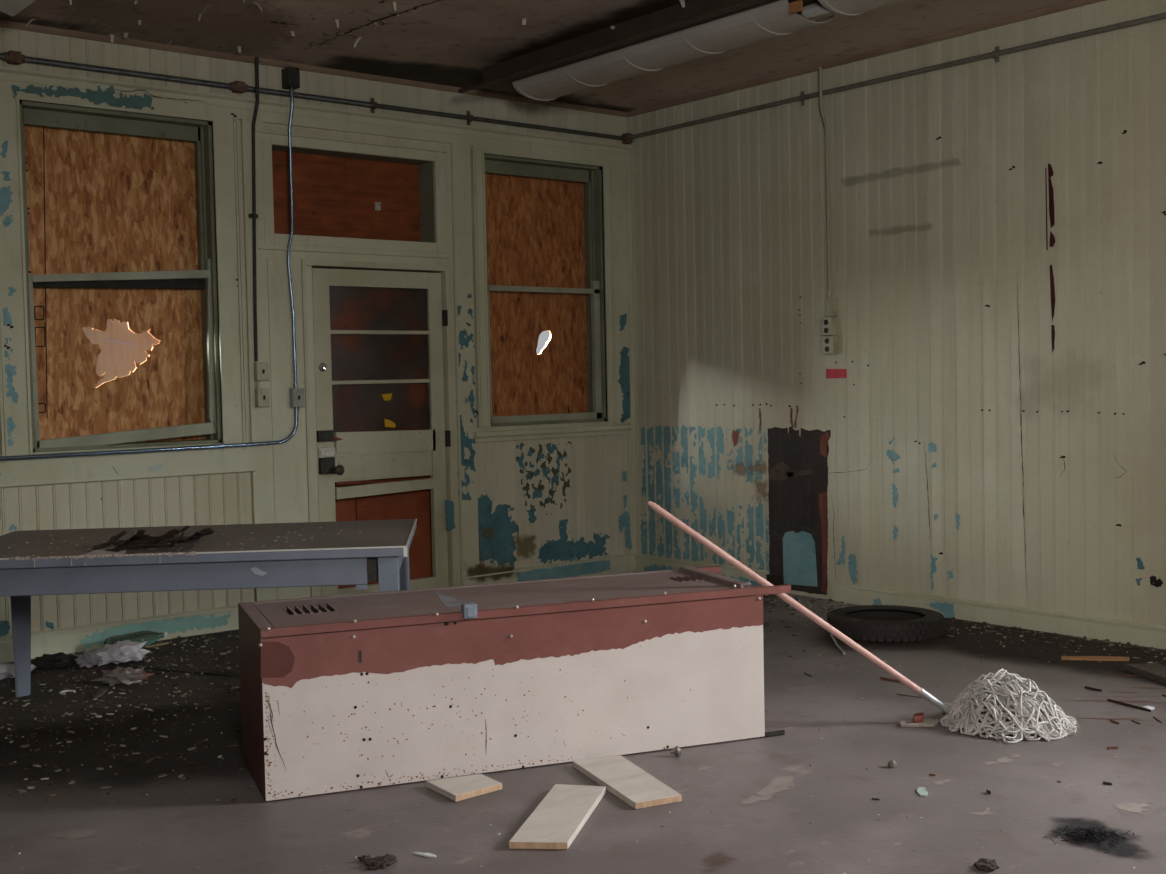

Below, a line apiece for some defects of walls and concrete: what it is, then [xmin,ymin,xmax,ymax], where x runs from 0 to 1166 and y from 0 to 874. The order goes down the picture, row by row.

crack [303,0,441,50]
peeling [11,84,154,112]
peeling [0,140,13,228]
peeling [3,287,19,404]
peeling [445,293,770,587]
peeling [80,612,231,649]